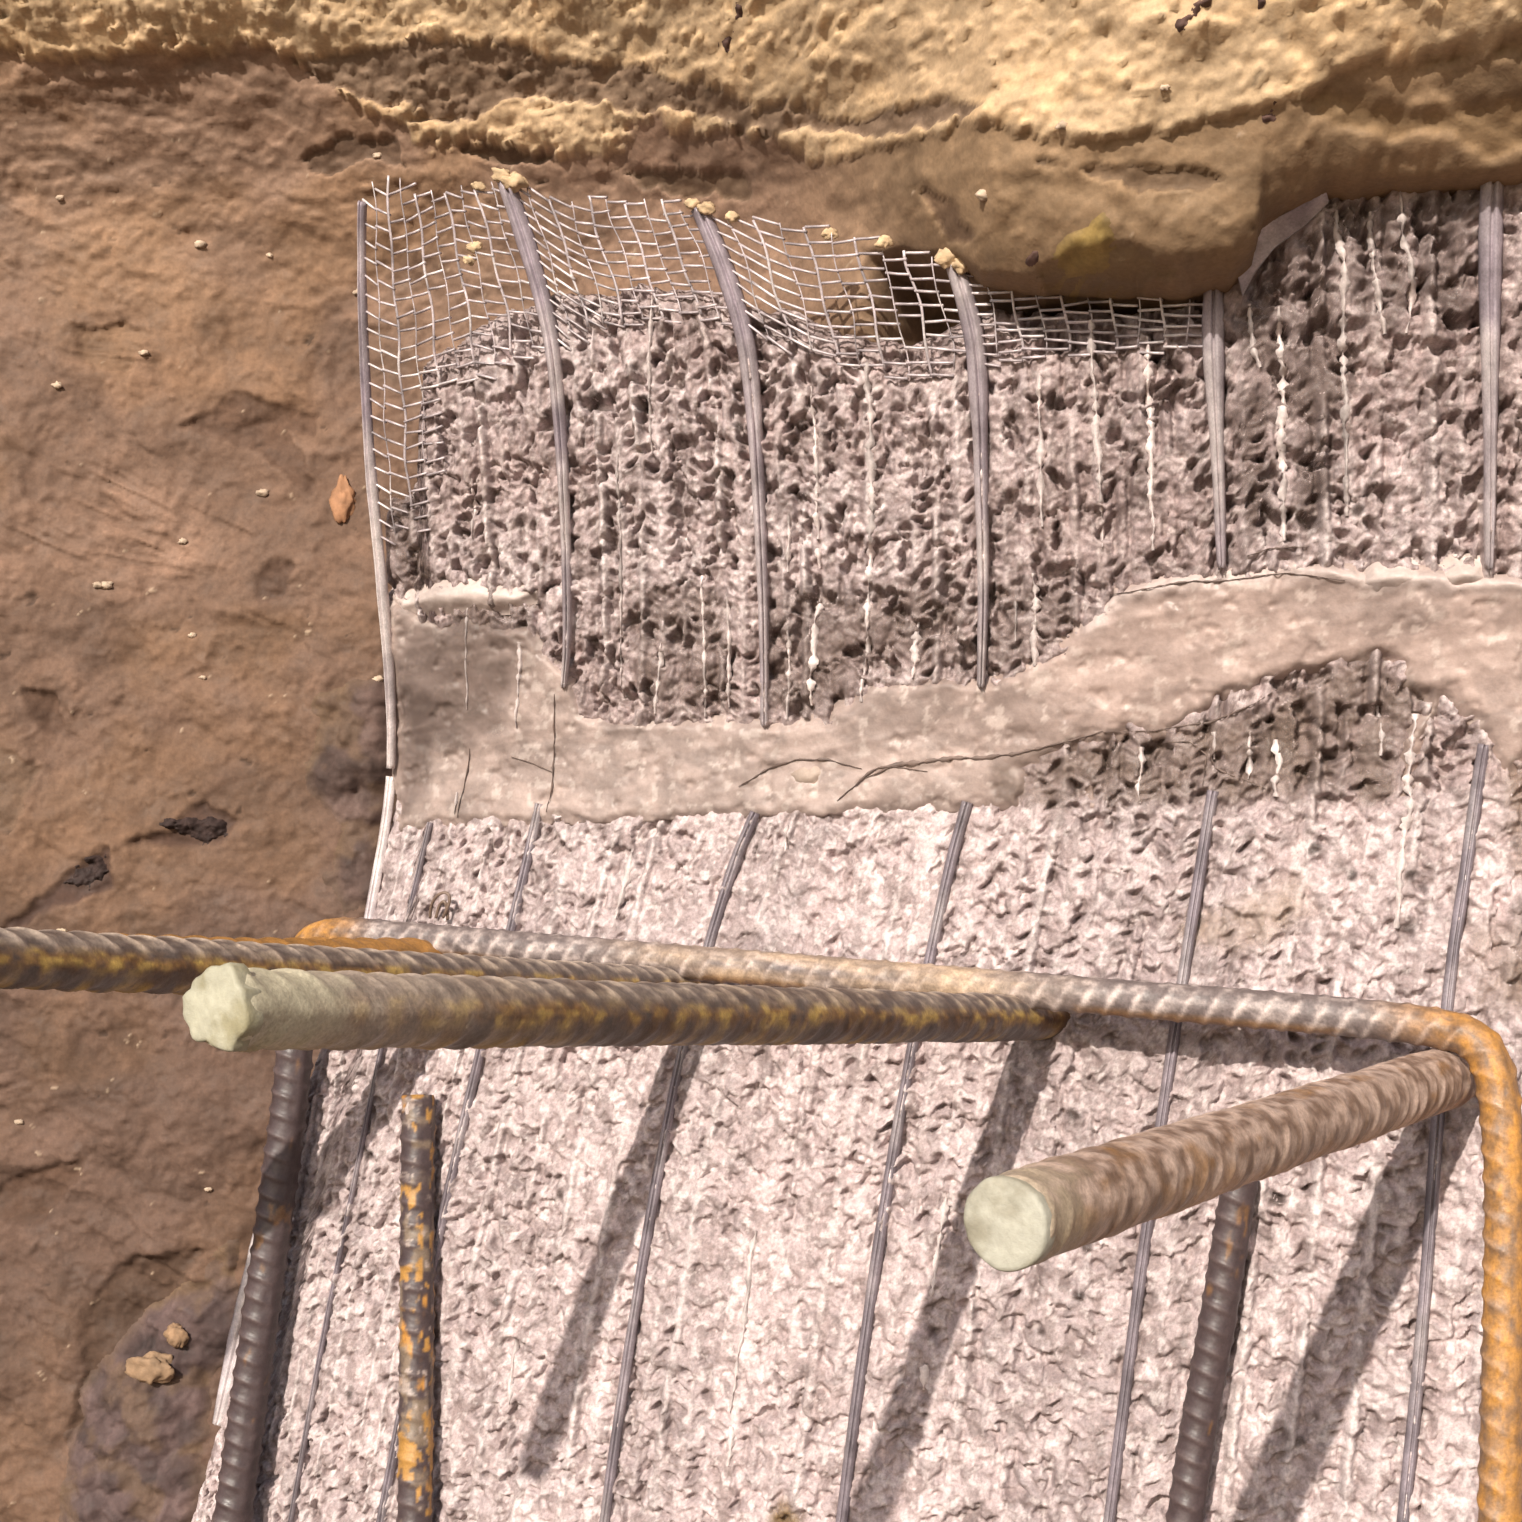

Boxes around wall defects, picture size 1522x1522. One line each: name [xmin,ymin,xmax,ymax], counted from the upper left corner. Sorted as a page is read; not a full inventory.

leakage [809,386,822,567]
leakage [859,362,878,702]
leakage [1035,373,1046,527]
leakage [1087,320,1105,547]
leakage [1143,336,1156,550]
leakage [1244,191,1464,541]
leakage [653,643,664,714]
leakage [700,575,732,717]
leakage [785,603,824,719]
leakage [910,622,922,678]
leakage [1013,573,1041,666]
rust [772,1506,799,1522]